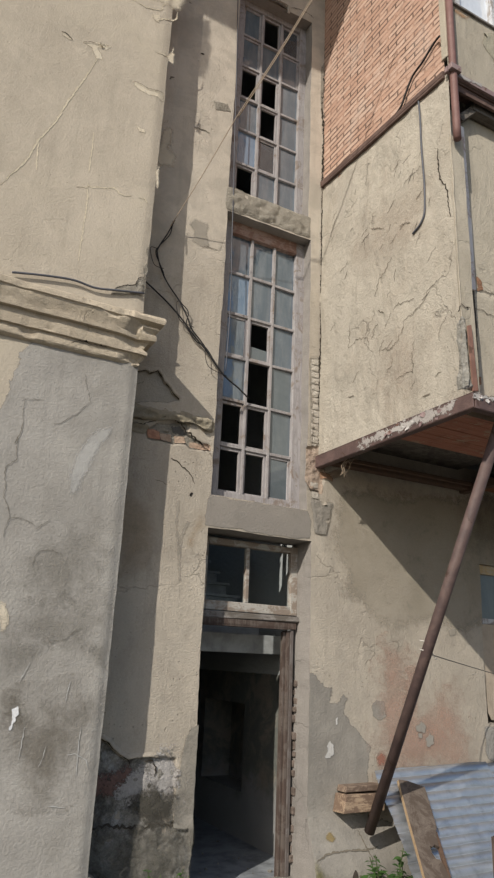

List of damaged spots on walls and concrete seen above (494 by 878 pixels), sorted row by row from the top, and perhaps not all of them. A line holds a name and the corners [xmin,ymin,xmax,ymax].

crack [394,150,451,216]
crack [330,201,436,385]
crack [3,424,48,537]
peeling [135,366,182,403]
flaking render [136,416,211,452]
spalling [305,358,341,536]
peeling [357,303,494,450]
spalling [88,734,193,878]
crack [317,832,378,863]